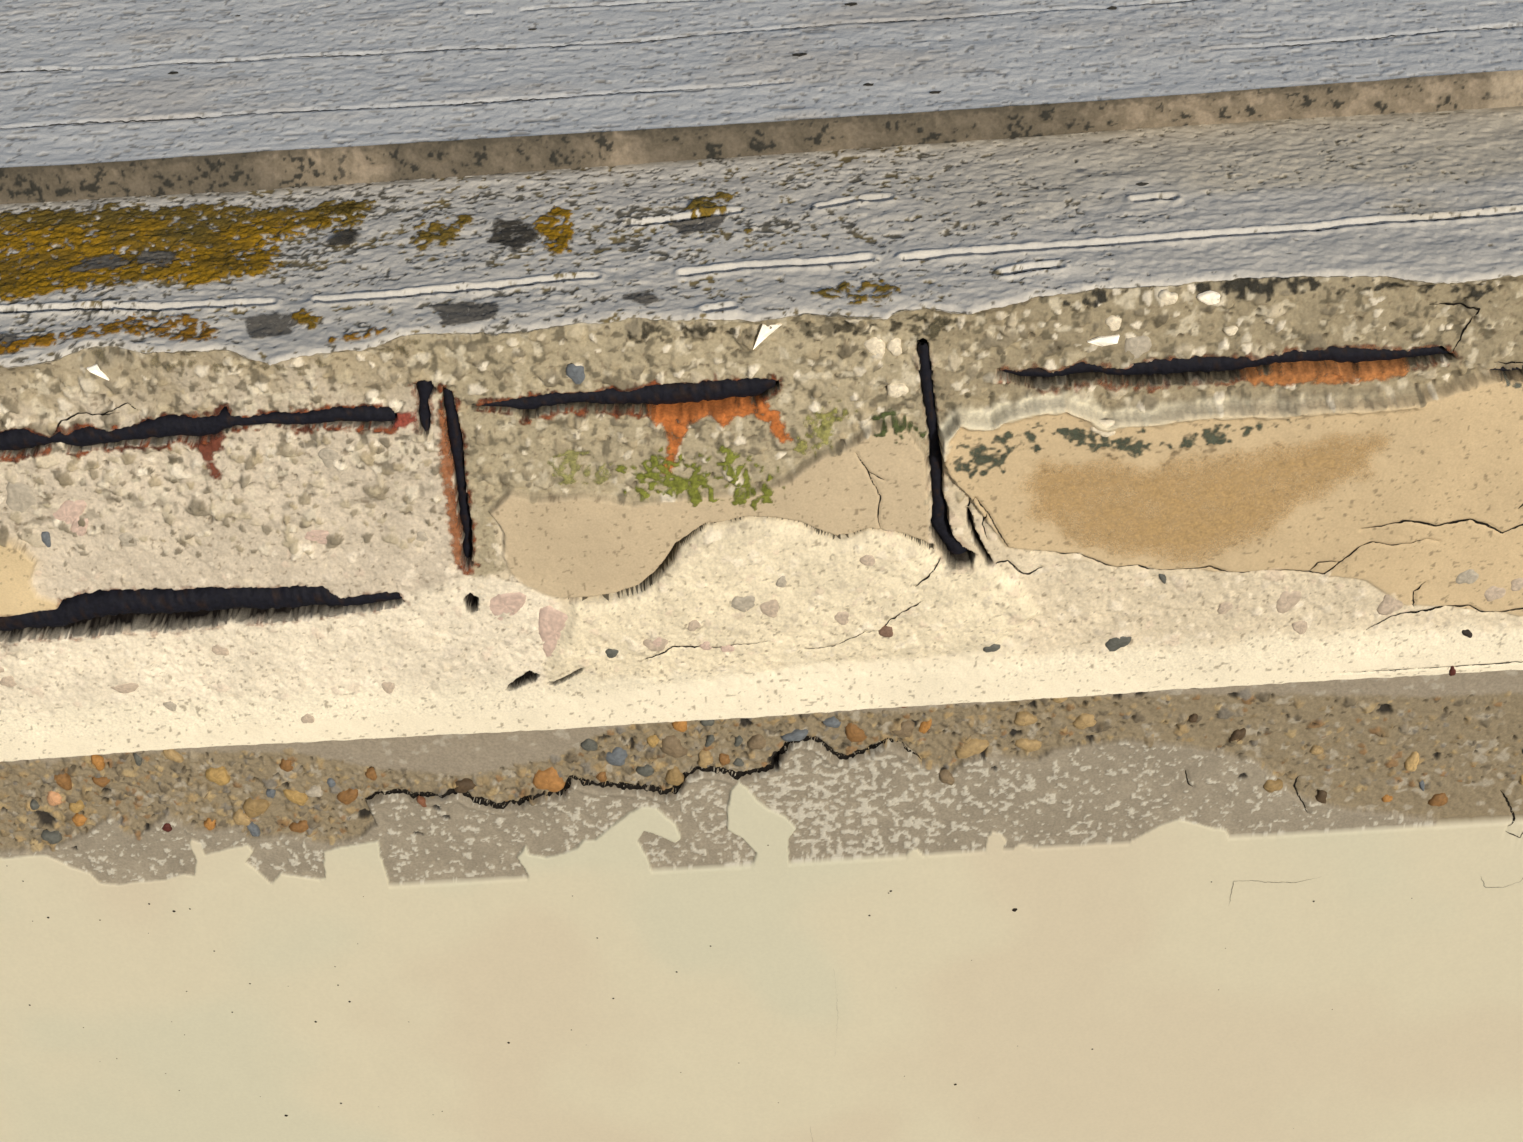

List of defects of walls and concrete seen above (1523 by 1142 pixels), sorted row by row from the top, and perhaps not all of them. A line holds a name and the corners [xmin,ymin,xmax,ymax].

peeling [327,229,360,246]
peeling [487,218,539,254]
peeling [671,215,727,235]
corrosion [1246,358,1408,386]
corrosion [647,396,793,473]
corrosion [438,410,463,565]
damp [1038,442,1376,555]
crack [967,498,1523,575]
spalling [0,275,1523,884]
crack [804,558,941,649]
crack [1368,582,1523,629]
crack [365,736,920,809]